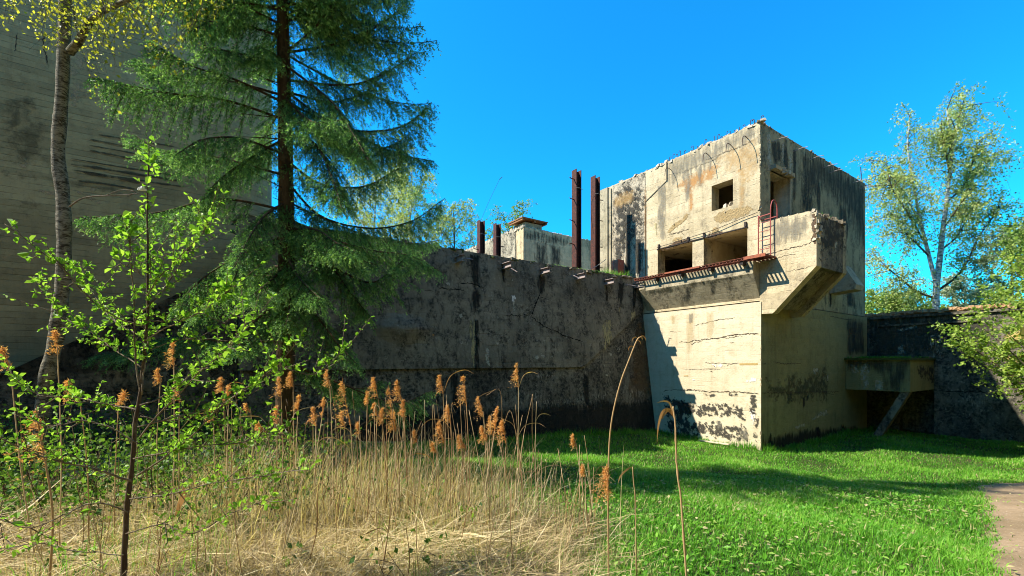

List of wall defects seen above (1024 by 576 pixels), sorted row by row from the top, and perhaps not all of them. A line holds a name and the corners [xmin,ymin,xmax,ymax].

leakage [606,128,754,320]
corrosion [681,166,718,209]
peeling [612,115,873,237]
crack [506,294,583,342]
leakage [354,368,858,450]